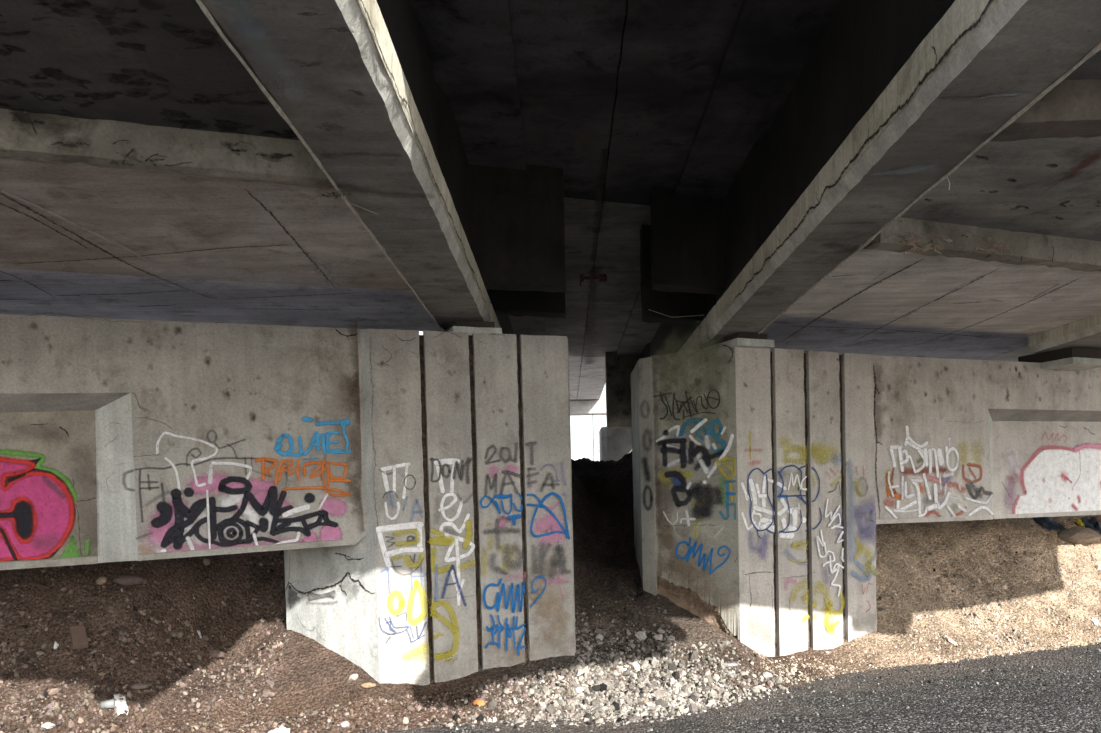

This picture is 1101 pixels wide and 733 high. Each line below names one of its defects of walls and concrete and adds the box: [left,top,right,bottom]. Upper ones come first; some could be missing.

crack [113,140,192,166]
crack [360,0,486,303]
crack [731,0,992,303]
crack [0,189,348,322]
crack [781,240,1079,345]
crack [73,392,173,555]
crack [286,328,508,641]
crack [873,365,883,519]